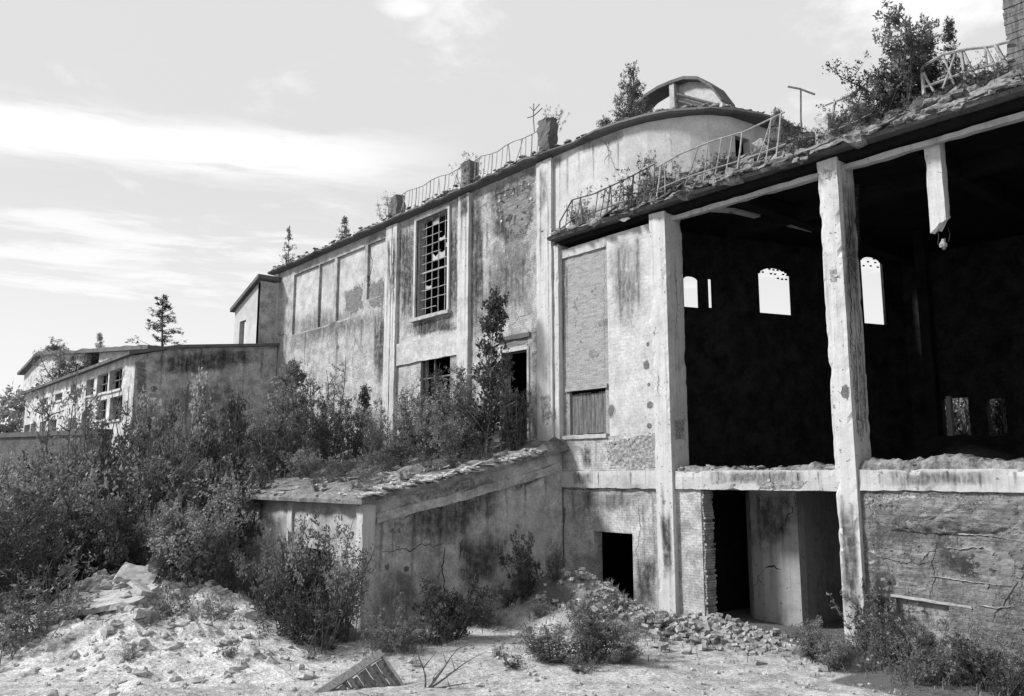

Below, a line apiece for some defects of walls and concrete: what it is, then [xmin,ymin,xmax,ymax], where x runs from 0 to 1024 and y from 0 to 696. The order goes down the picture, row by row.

water stain [493,180,532,238]
spalling [344,277,384,314]
spalling [603,431,656,471]
water stain [414,495,487,538]
crack [383,539,463,604]
water stain [460,543,505,590]
crack [876,534,1018,617]